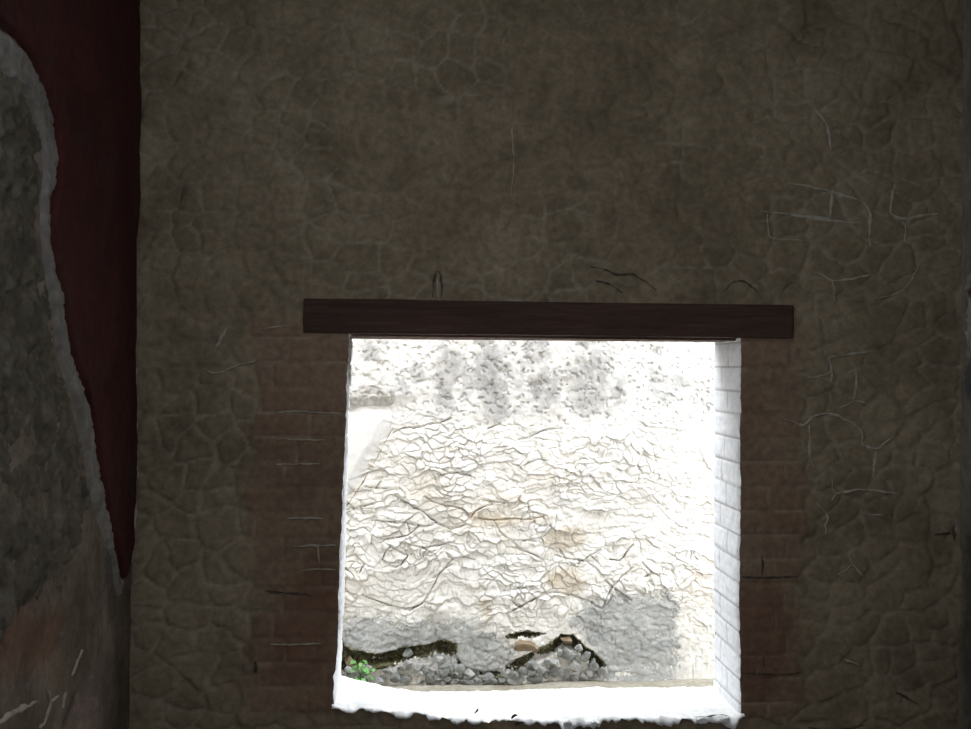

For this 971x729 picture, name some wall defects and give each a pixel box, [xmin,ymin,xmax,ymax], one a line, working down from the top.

crack [742,556,798,579]